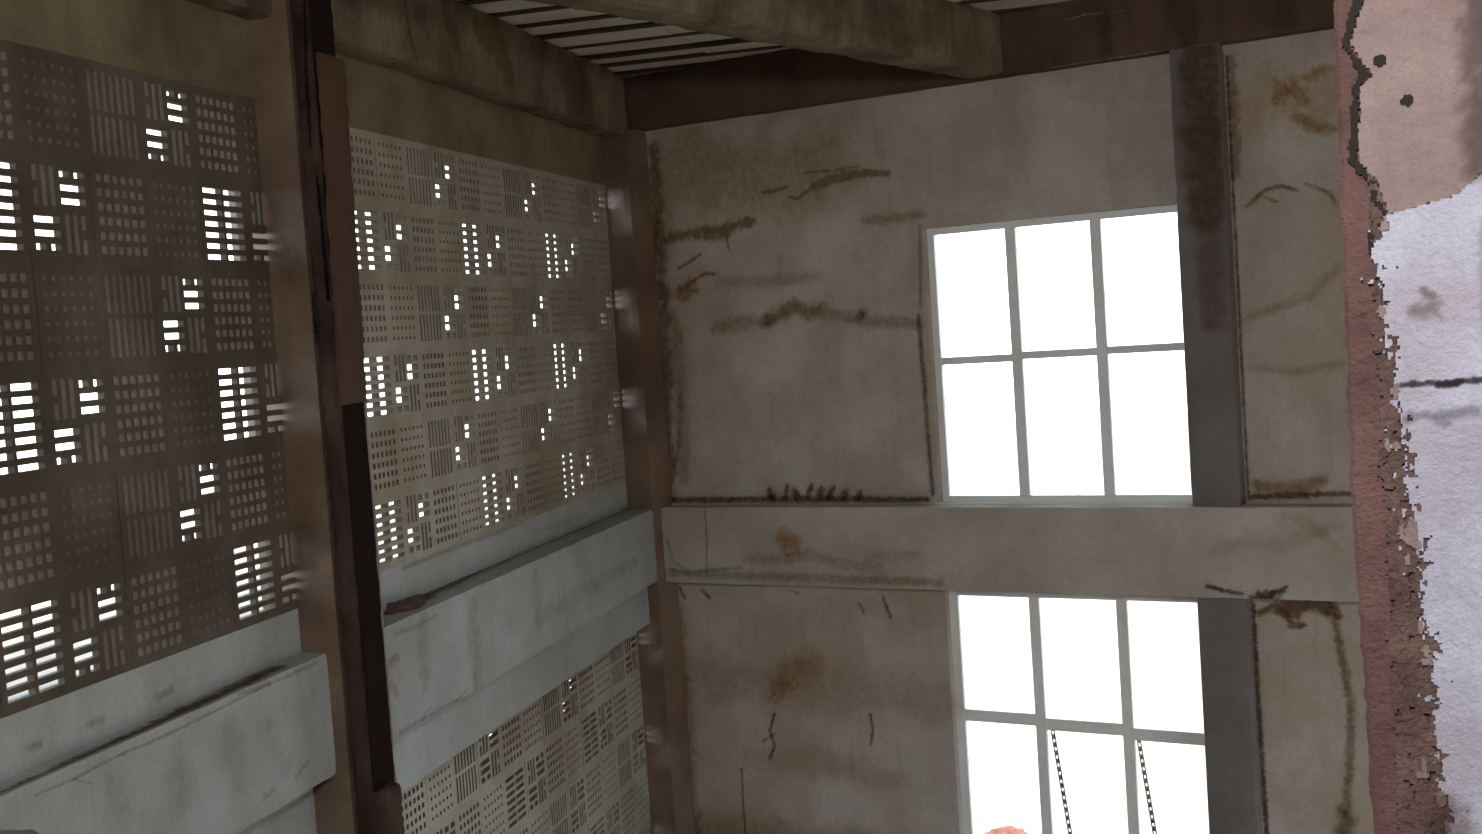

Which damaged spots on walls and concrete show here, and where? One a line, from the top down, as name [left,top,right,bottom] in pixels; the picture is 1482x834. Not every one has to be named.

crack [1342,0,1388,253]
peeling [1350,0,1482,243]
spalling [1371,263,1468,834]